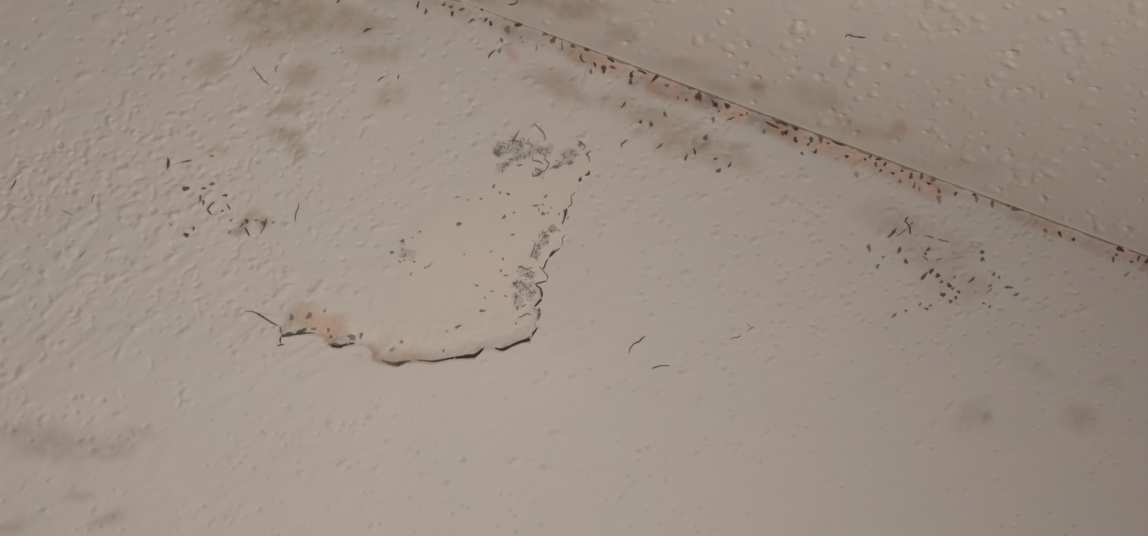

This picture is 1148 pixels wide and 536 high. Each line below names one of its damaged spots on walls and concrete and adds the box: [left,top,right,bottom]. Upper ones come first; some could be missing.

peeling [239,151,598,389]
crack [455,124,586,329]